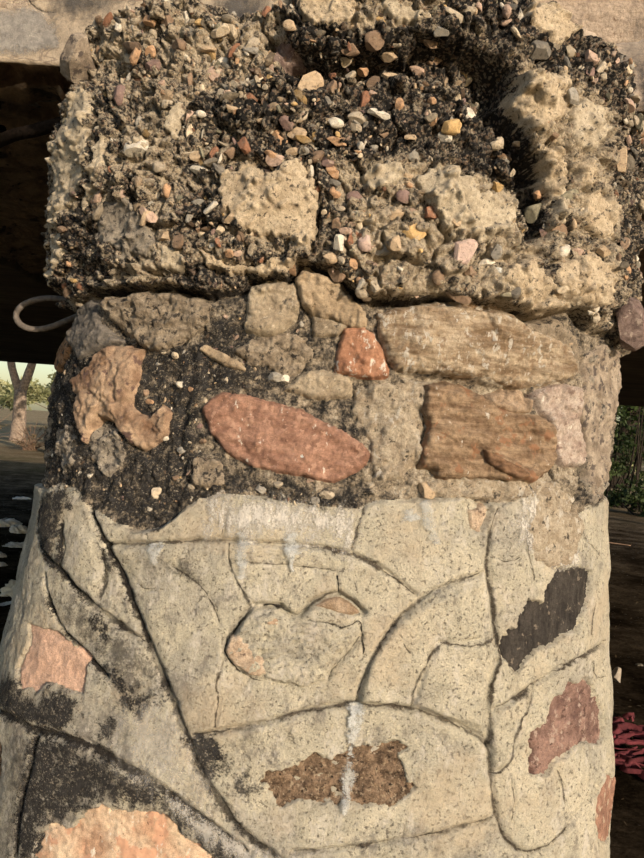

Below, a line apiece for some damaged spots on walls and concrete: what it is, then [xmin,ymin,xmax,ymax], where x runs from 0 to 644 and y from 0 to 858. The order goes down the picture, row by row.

water stain [54,0,108,17]
spalling [535,0,644,44]